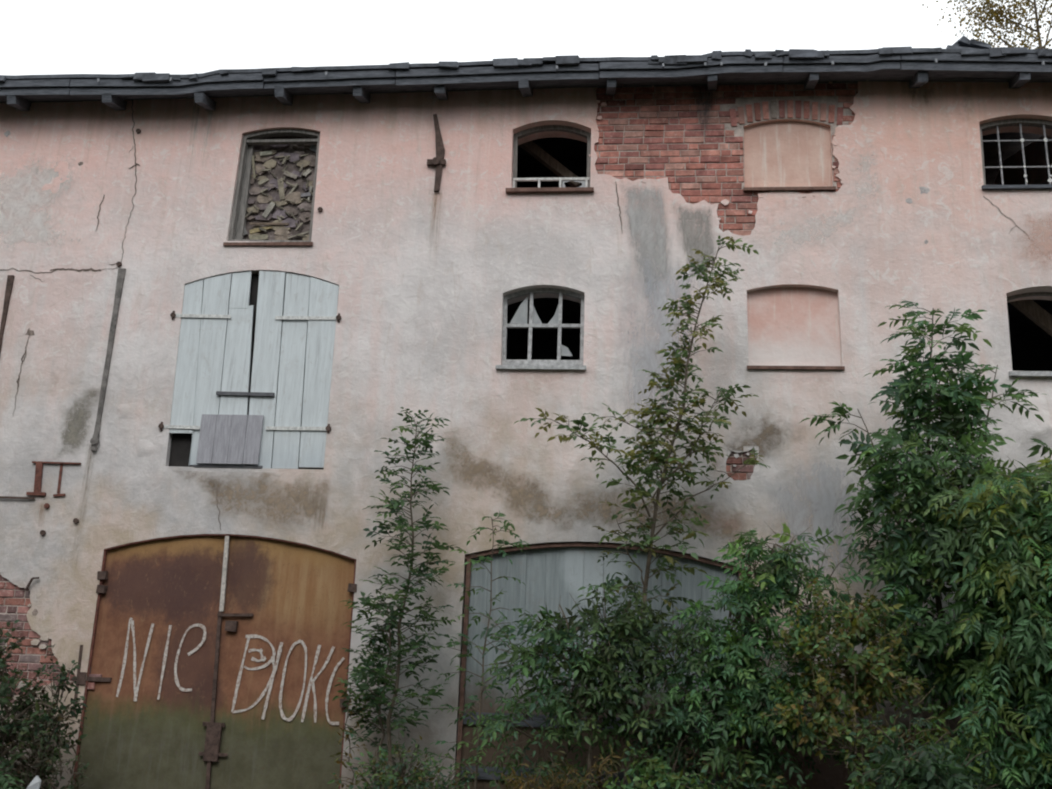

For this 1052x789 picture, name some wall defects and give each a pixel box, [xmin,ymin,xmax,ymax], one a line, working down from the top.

crack [1,100,140,282]
flaking render [589,84,858,236]
crack [983,196,1049,253]
damp [451,441,564,520]
damp [577,495,738,538]
flaking render [717,444,765,486]
flaking render [0,571,102,709]